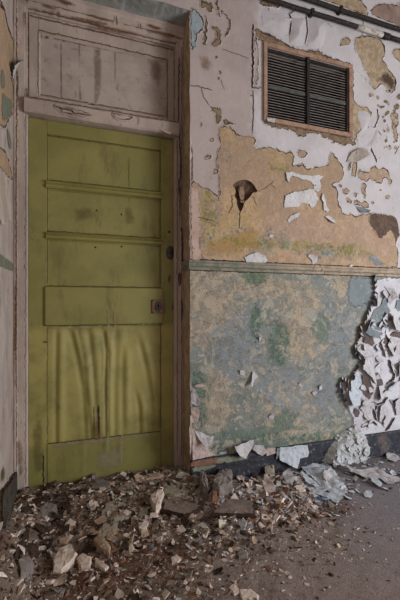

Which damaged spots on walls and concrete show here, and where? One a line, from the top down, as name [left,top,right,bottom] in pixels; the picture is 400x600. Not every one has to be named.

peeling [0,0,24,131]
crack [178,58,223,262]
peeling [189,0,232,60]
peeling [189,28,400,473]